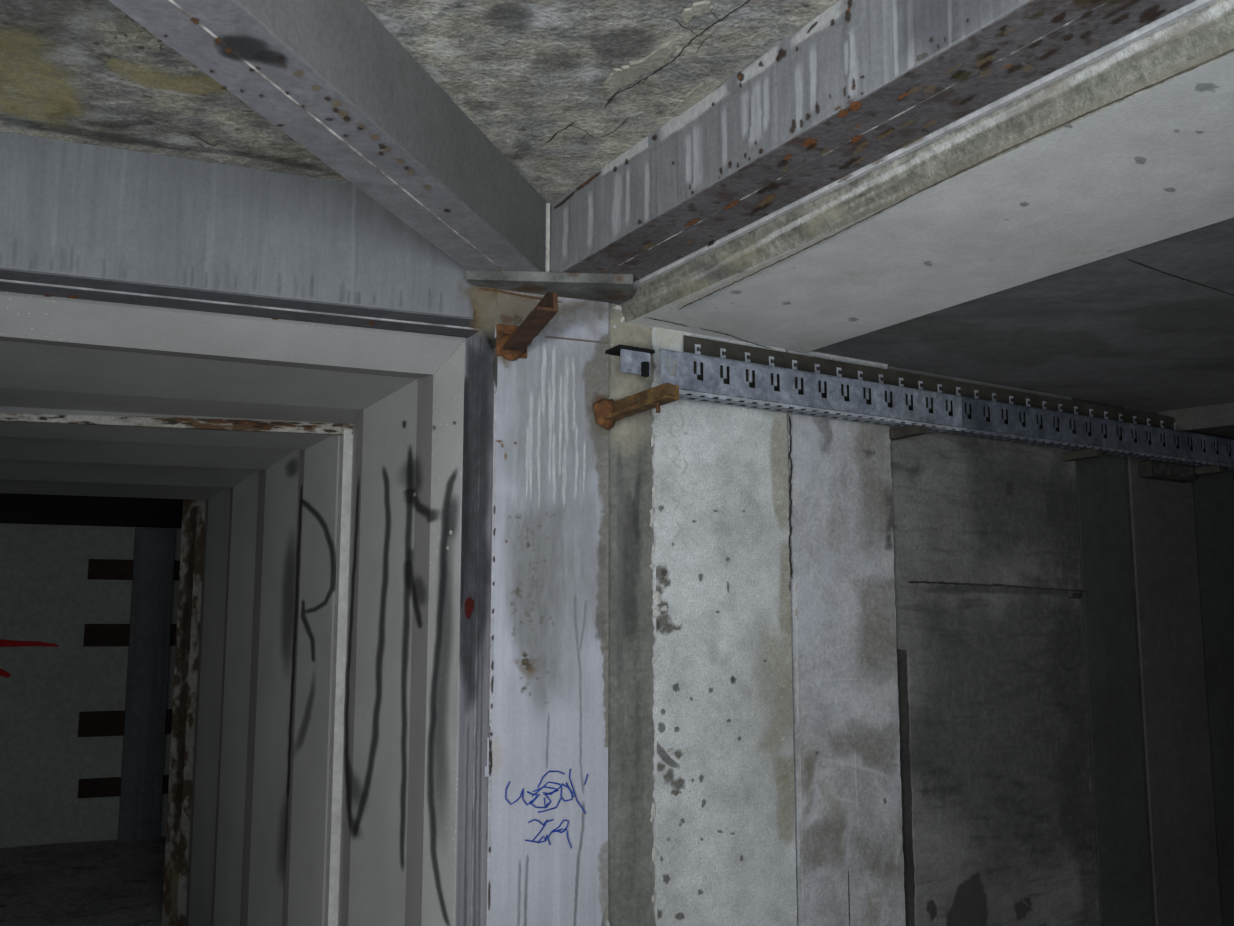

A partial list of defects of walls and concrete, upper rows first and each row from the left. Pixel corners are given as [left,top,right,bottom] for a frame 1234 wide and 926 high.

water stain [0,0,283,164]
crack [547,0,750,143]
rust [807,0,852,33]
rust [1007,0,1166,74]
rust [313,85,413,175]
rust [554,159,628,209]
rust [750,75,864,215]
rust [173,417,343,433]
rust [173,507,197,836]
water stain [927,874,987,926]